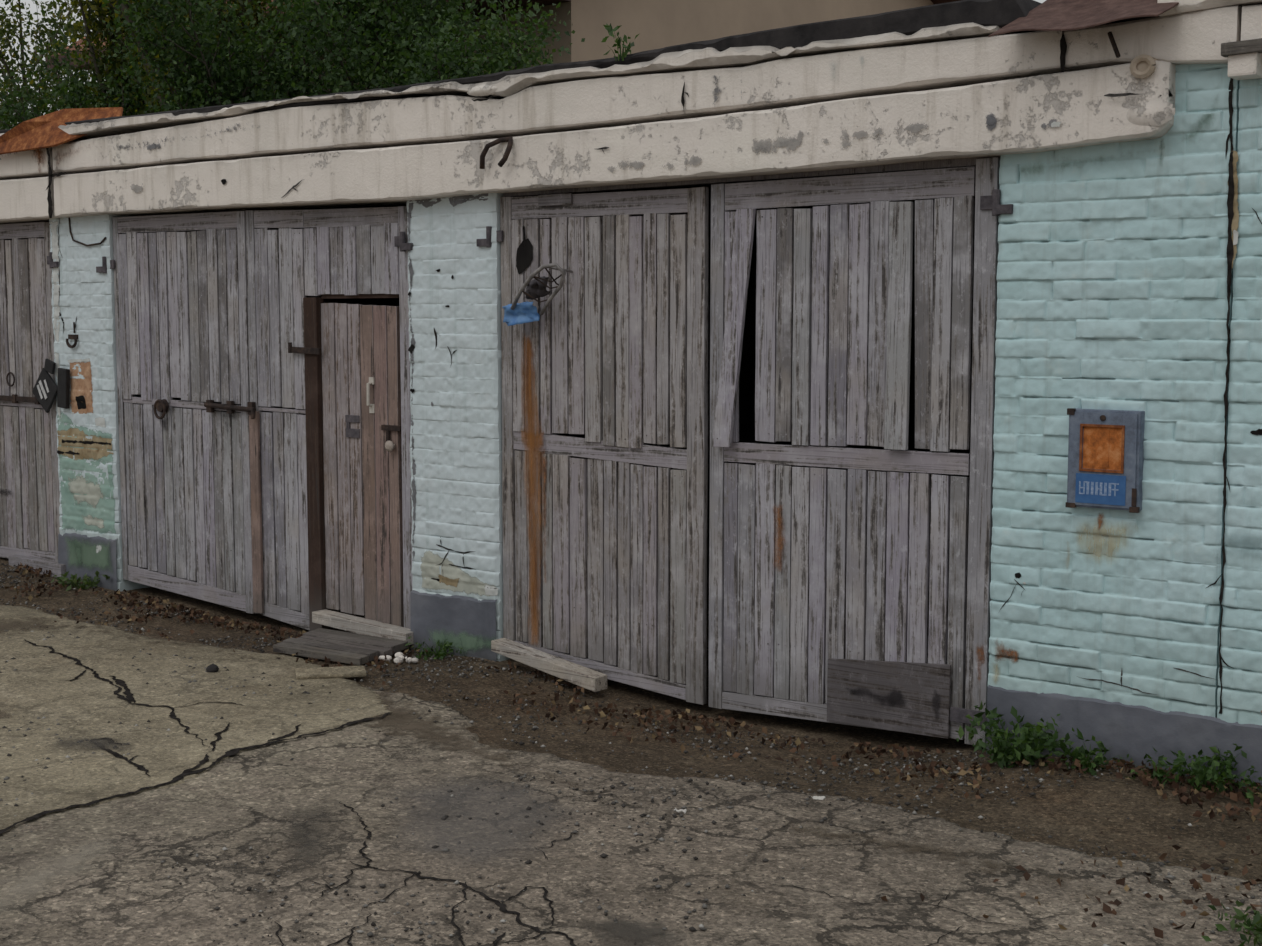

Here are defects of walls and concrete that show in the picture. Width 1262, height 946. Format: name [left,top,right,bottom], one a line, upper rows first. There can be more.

peeling [608,161,644,172]
peeling [664,155,702,170]
peeling [752,124,927,154]
peeling [407,193,498,596]
crack [1175,78,1262,714]
peeling [57,358,116,553]
rust [522,337,546,634]
crack [1079,670,1156,695]
crack [0,639,390,834]
crack [274,919,284,946]
crack [347,872,416,946]
crack [450,848,555,946]